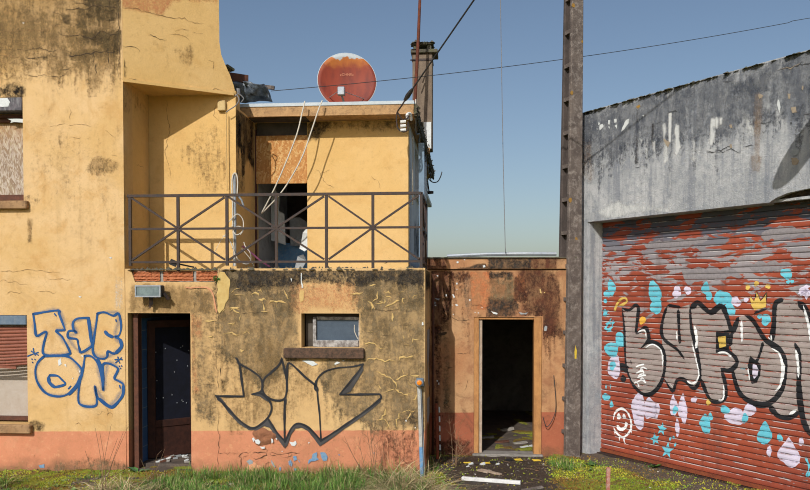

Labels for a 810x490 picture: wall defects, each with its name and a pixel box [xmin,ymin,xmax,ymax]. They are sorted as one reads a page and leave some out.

leakage [0,0,125,88]
crack [0,0,203,80]
leakage [582,52,810,190]
leakage [238,123,251,177]
flaking render [133,271,230,313]
peeling [642,235,709,251]
peeling [681,266,743,285]
peeling [745,260,792,272]
peeling [761,226,810,241]
crack [203,288,289,385]
leakage [116,258,562,471]